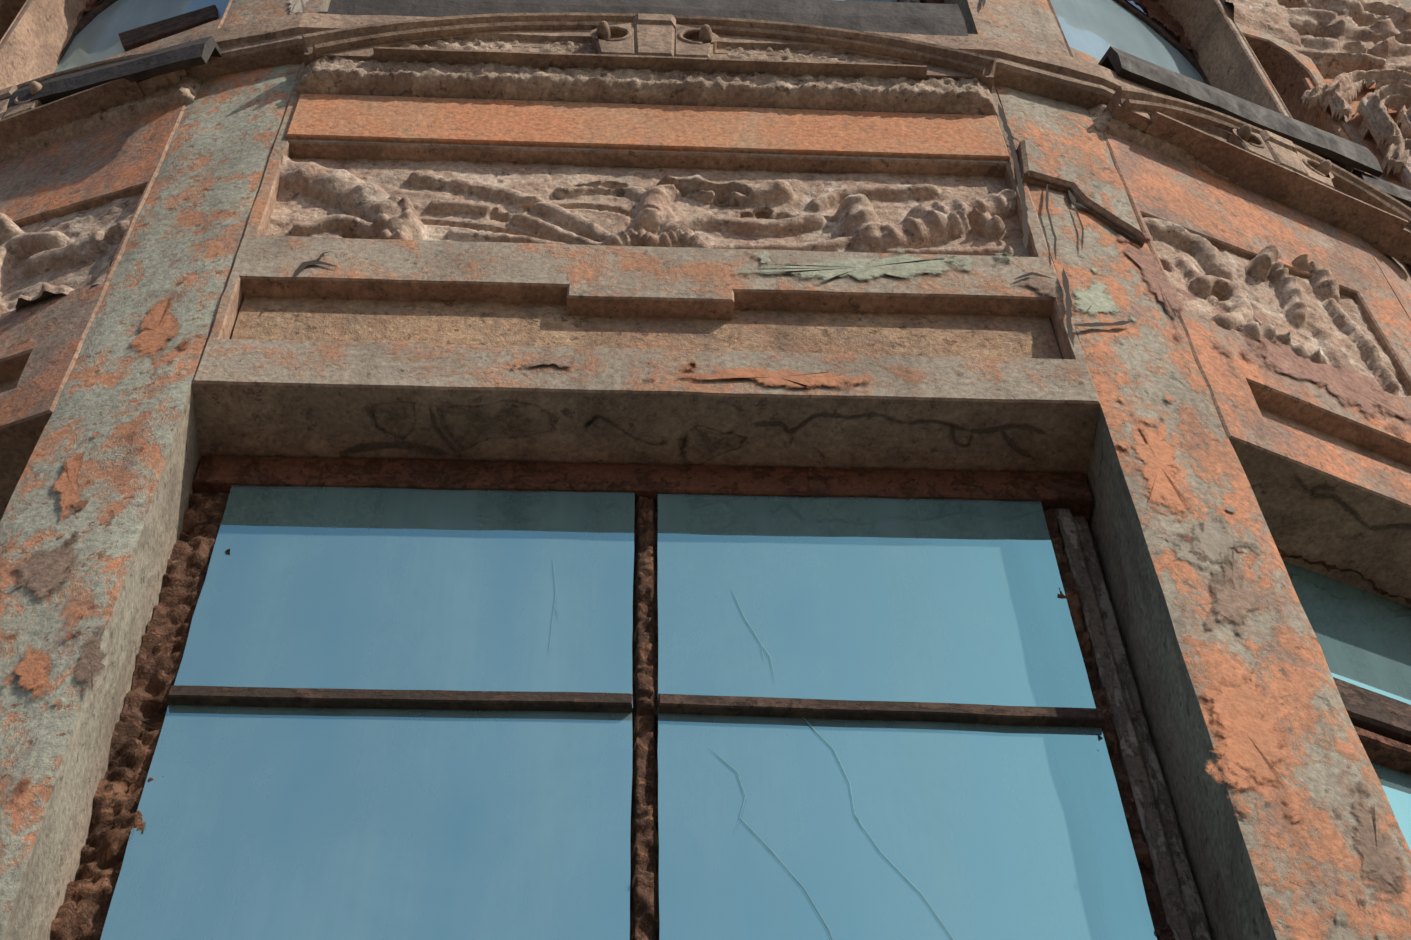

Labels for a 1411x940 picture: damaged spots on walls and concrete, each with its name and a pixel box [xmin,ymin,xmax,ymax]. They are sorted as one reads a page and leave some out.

peeling [733,249,974,283]
peeling [993,253,1137,322]
crack [998,104,1144,347]
peeling [678,360,873,389]
spalling [0,432,100,597]
peeling [1118,394,1264,636]
peeling [3,622,113,704]
peeling [1200,665,1304,823]
spalling [1325,780,1406,940]